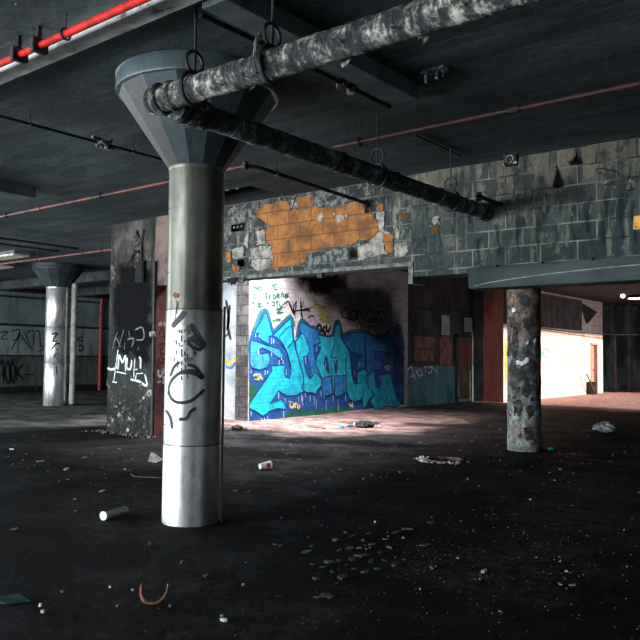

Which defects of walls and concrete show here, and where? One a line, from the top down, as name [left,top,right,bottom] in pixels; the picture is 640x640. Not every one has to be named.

peeling [226,190,409,285]
peeling [507,294,538,445]